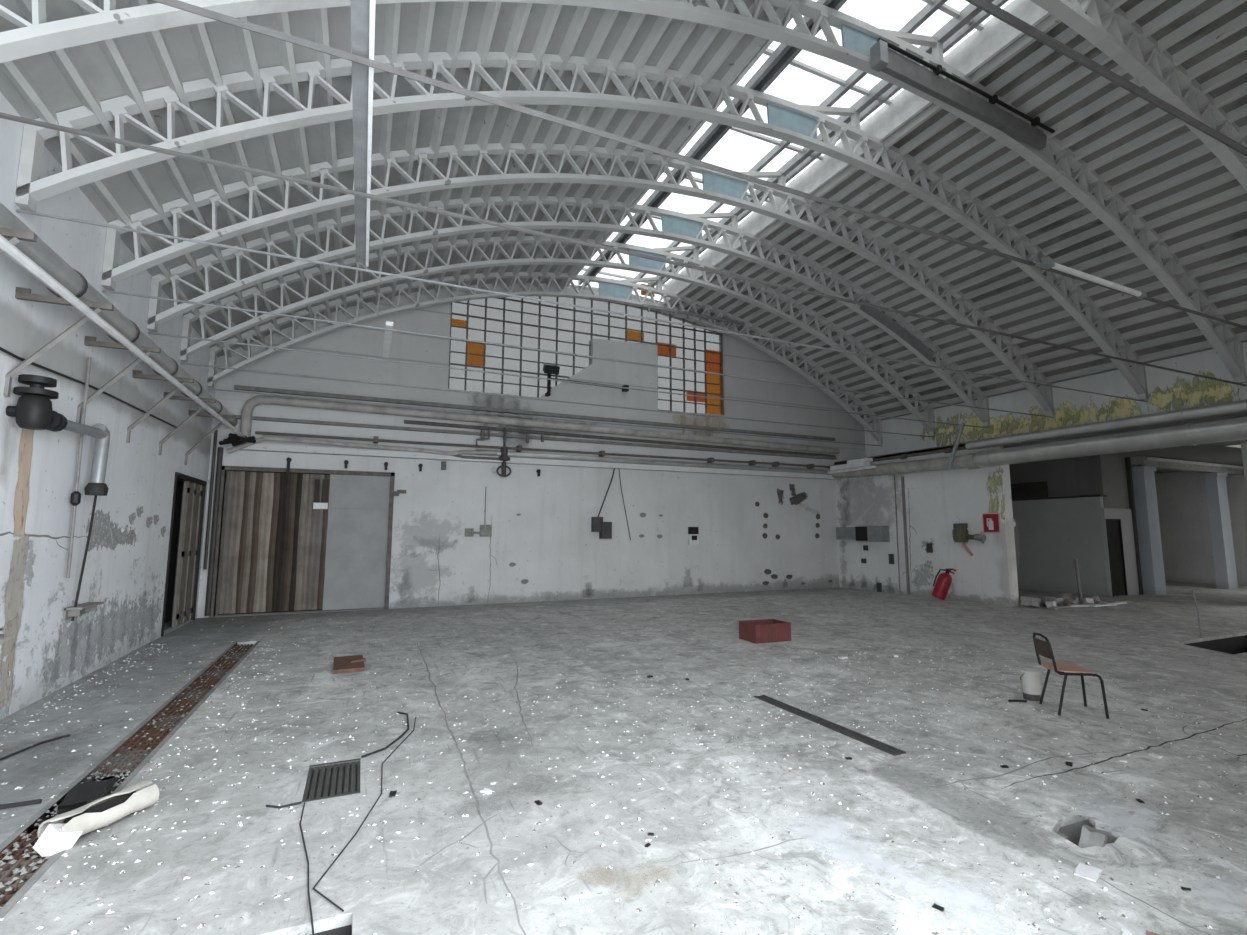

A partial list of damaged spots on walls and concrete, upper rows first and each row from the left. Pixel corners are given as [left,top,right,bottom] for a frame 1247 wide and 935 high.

rust [0,428,34,708]
flaking render [86,506,166,552]
crack [394,641,544,935]
crack [888,718,1247,799]
crack [555,837,589,866]